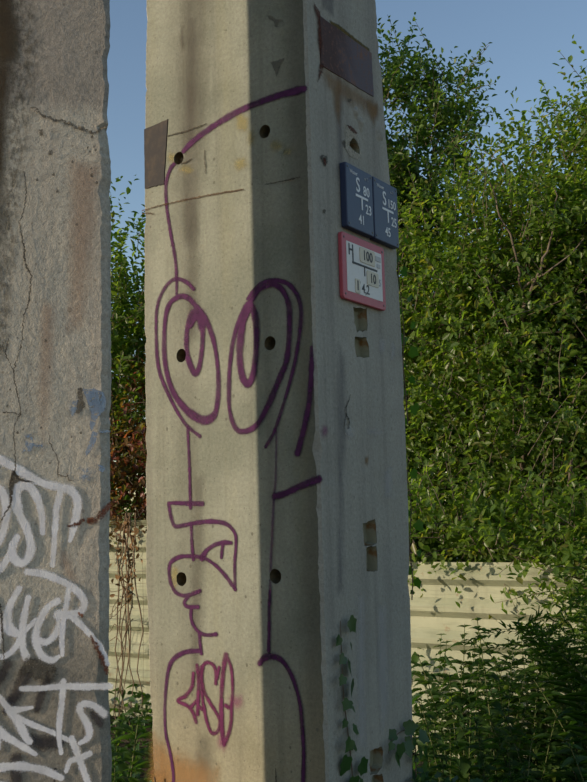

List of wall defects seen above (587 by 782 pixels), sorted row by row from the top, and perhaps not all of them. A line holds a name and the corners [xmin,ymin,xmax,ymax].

rust [314,4,322,53]
crack [0,173,34,523]
spalling [70,388,85,415]
crack [49,436,74,481]
rust [67,499,115,527]
crack [0,604,8,675]
rust [90,635,109,675]